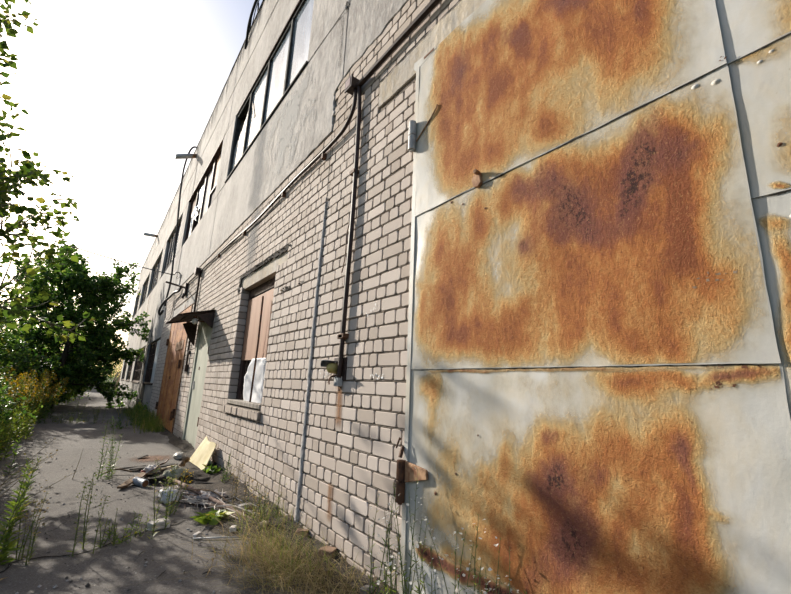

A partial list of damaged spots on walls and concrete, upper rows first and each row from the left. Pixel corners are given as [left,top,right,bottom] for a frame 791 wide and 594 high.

rust [415,0,791,594]